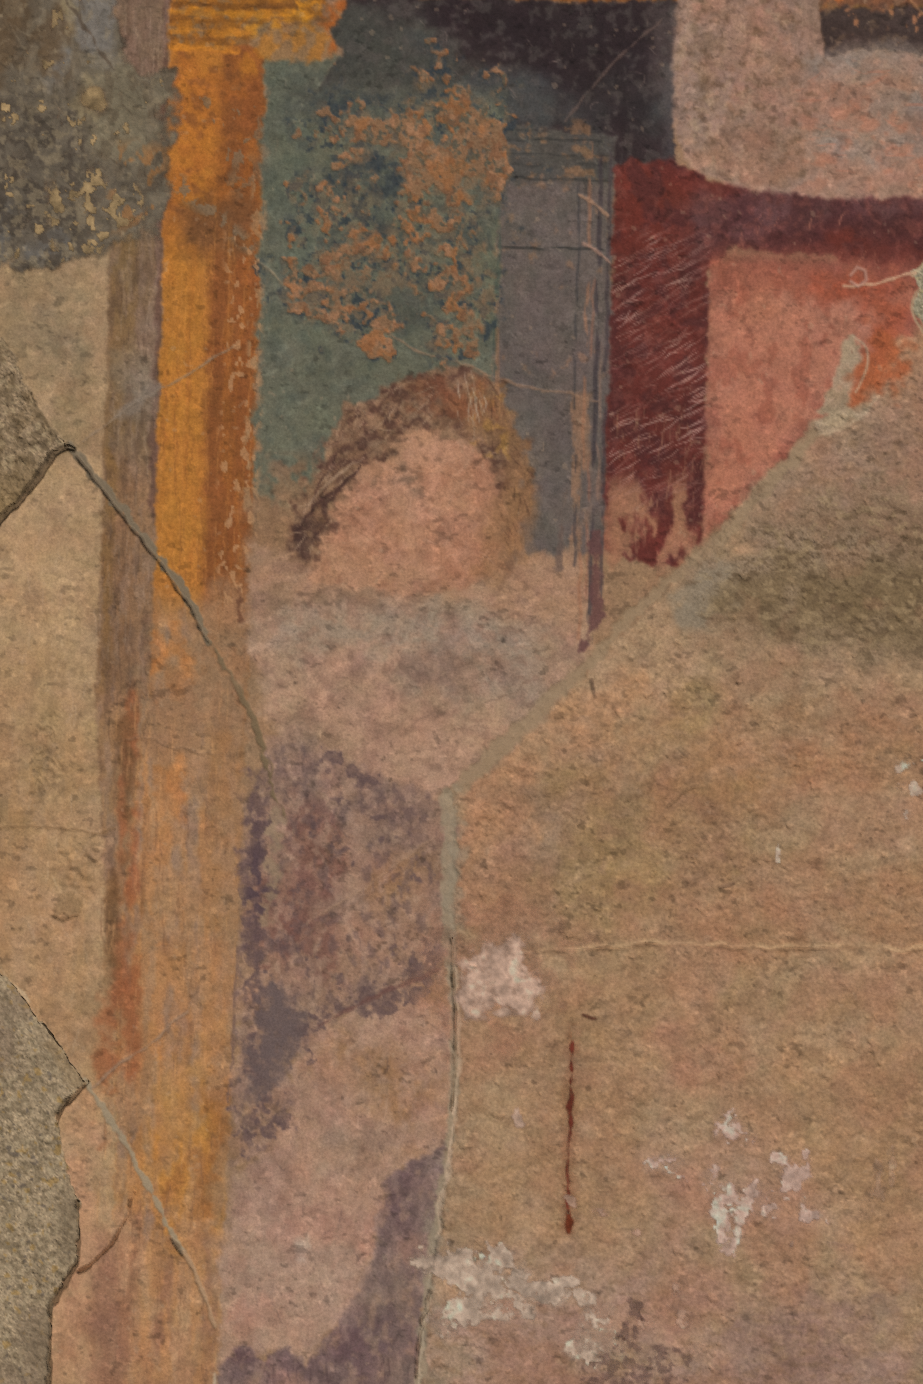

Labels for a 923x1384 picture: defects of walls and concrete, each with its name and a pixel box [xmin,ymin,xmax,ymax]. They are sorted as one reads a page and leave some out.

crack [843,267,917,289]
crack [68,441,288,929]
efflorescence [454,933,545,1020]
crack [415,424,820,1384]
crack [523,943,923,956]
crack [77,1003,218,1330]
efflorescence [714,1111,747,1144]
efflorescence [702,1149,827,1257]
efflorescence [410,1242,610,1365]